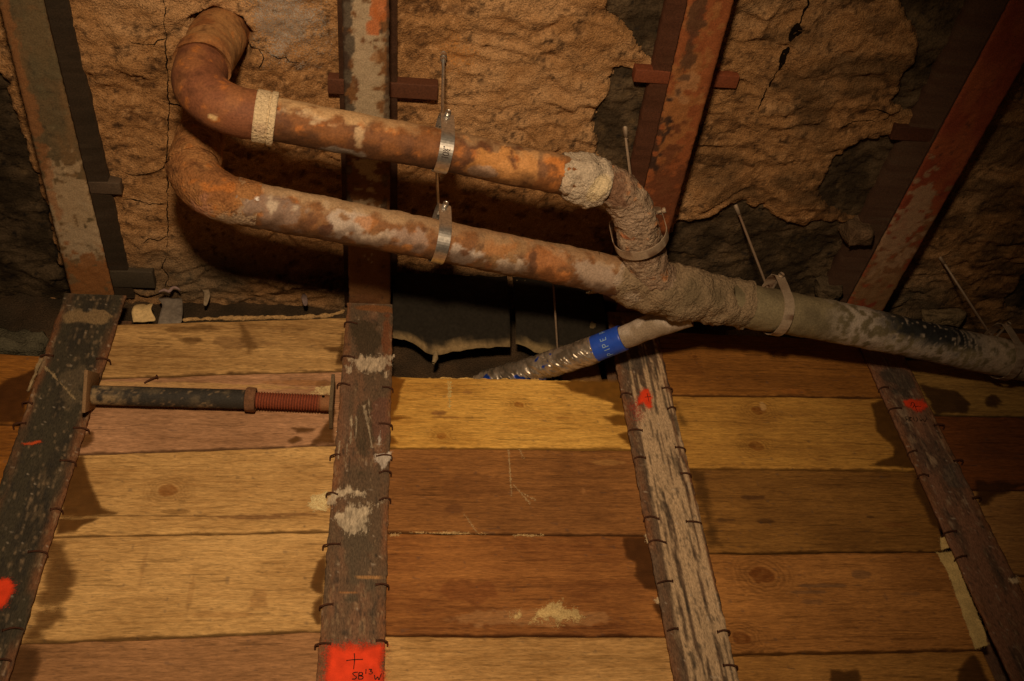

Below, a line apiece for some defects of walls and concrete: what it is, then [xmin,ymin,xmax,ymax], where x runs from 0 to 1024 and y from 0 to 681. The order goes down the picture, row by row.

spalling [606,0,664,58]
crack [758,0,810,109]
spalling [892,0,965,110]
crack [125,0,181,287]
spalling [593,67,646,171]
spalling [665,135,895,297]